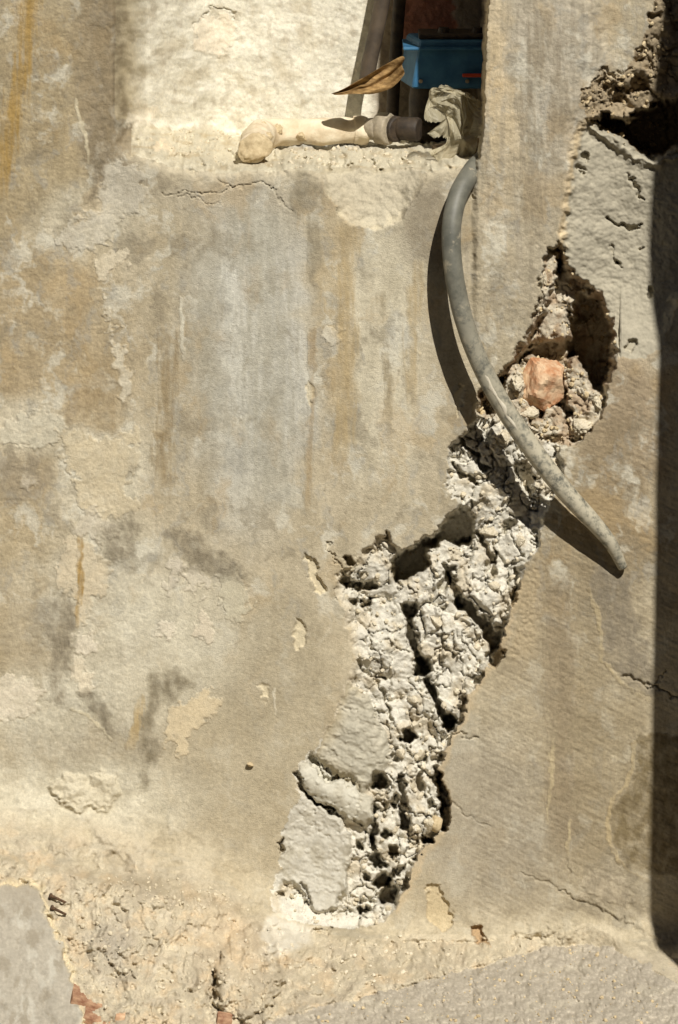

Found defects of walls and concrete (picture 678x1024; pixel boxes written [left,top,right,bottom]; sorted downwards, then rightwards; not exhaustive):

spalling [579,0,678,159]
crack [162,177,293,213]
rust [74,535,86,629]
water stain [92,509,145,571]
water stain [161,523,251,588]
spalling [270,243,620,930]
crack [657,669,678,701]
peeling [161,685,224,762]
crack [520,861,572,897]